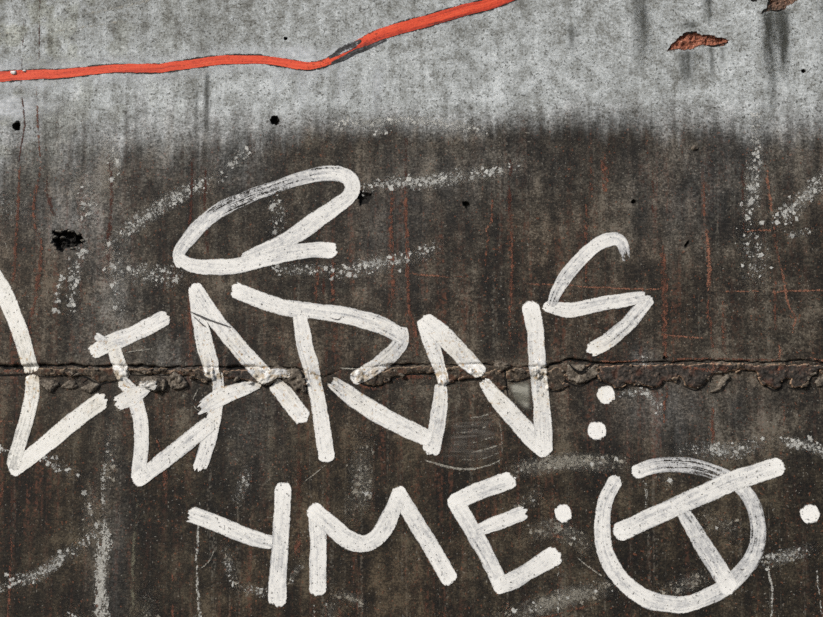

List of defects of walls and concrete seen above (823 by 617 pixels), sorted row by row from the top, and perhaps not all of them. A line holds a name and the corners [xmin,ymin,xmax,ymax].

crack [0,358,823,396]